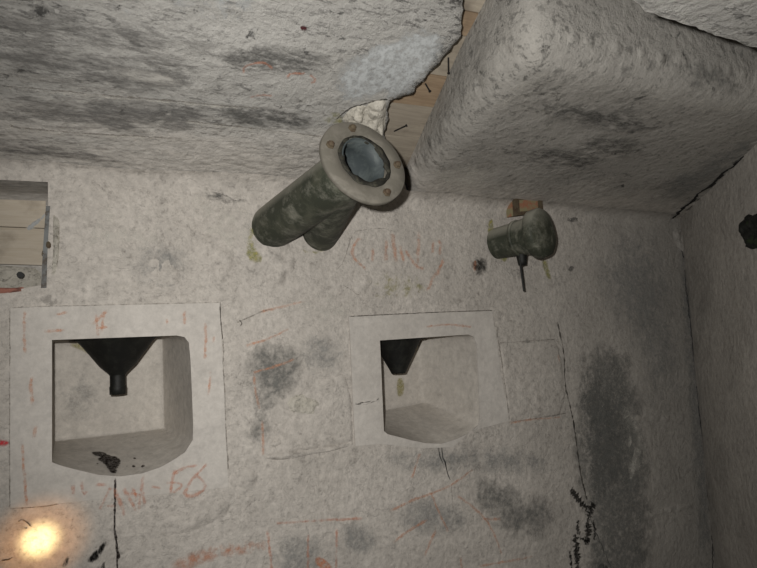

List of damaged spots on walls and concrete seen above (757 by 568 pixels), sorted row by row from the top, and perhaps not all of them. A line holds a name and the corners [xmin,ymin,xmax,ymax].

spalling [343,99,386,136]
water stain [256,351,297,397]
crack [558,324,587,499]
water stain [569,355,646,568]